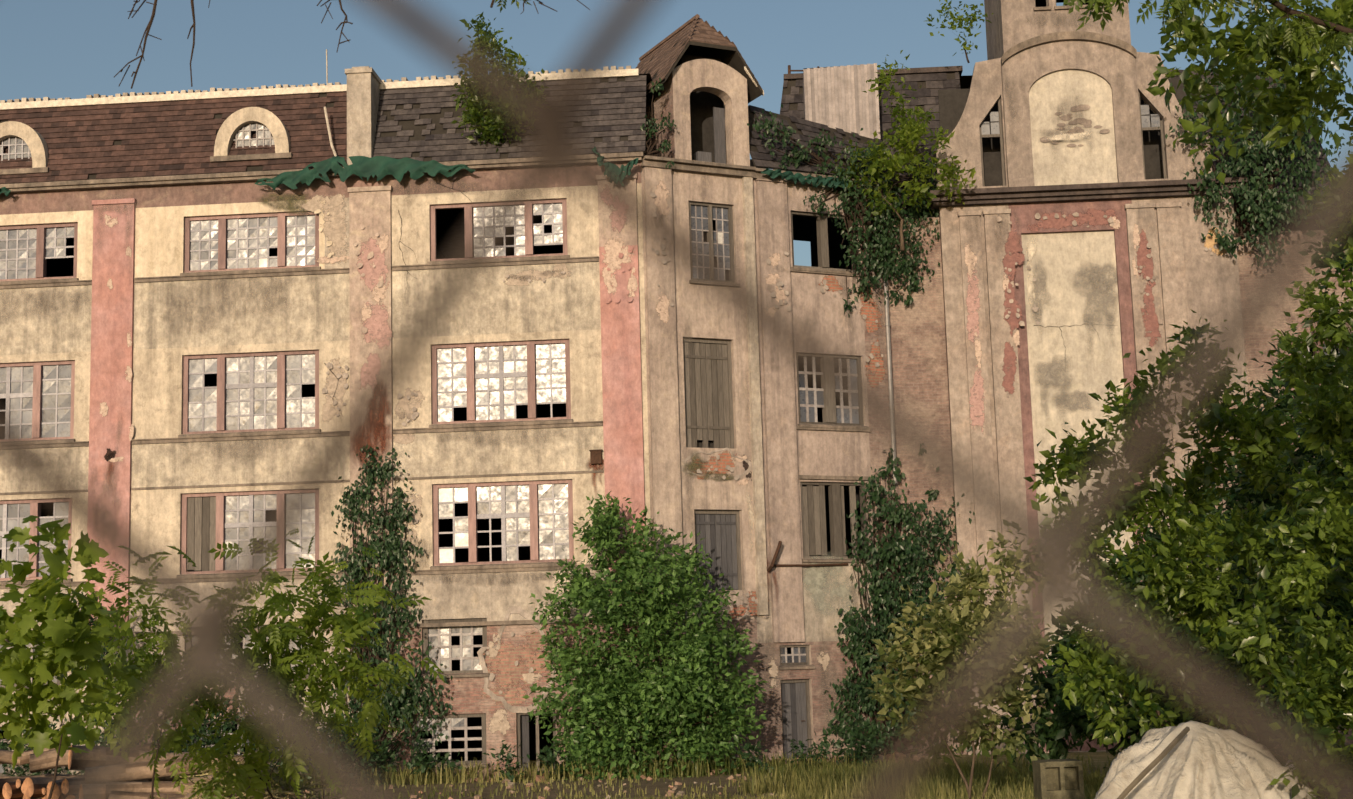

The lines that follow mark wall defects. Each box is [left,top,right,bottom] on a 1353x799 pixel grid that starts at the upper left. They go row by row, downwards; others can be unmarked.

peeling [650,180,671,216]
peeling [602,213,638,303]
peeling [656,284,674,323]
damp [1032,266,1046,320]
peeling [997,209,1163,394]
damp [1074,265,1117,325]
peeling [964,243,985,432]
damp [1038,360,1090,411]
flaking render [680,448,752,485]
flaking render [477,606,560,735]